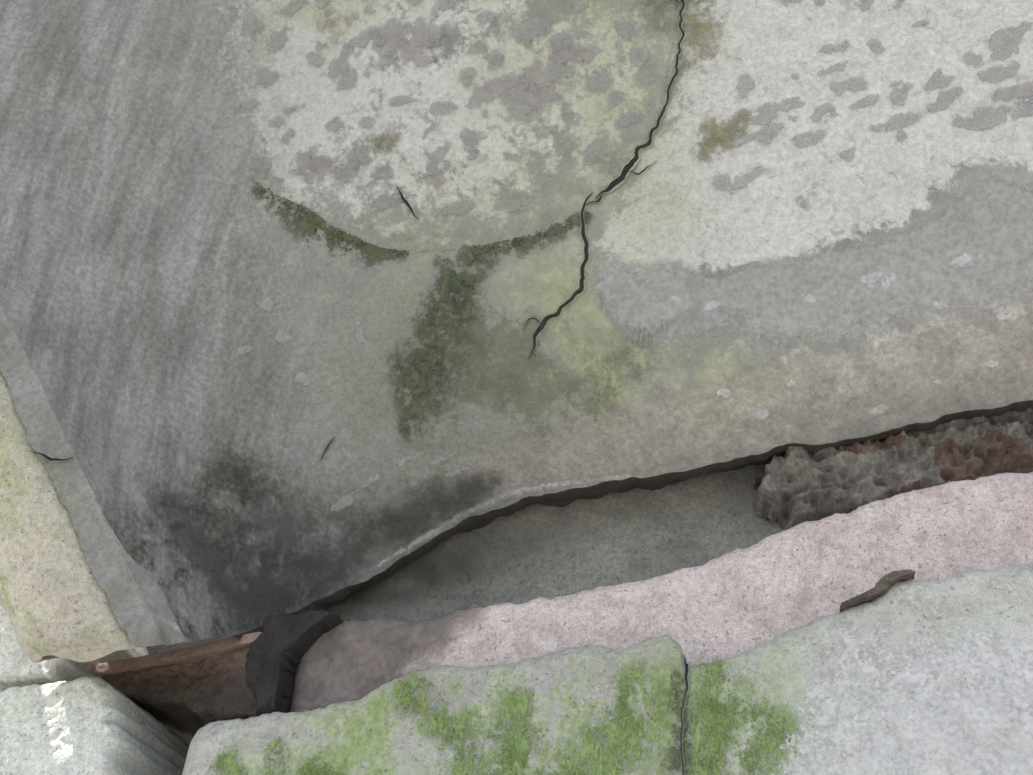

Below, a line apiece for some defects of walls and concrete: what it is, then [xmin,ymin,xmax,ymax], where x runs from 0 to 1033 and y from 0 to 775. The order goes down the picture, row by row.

crack [522,0,686,359]
flaking render [751,405,1033,531]
crack [680,654,690,775]